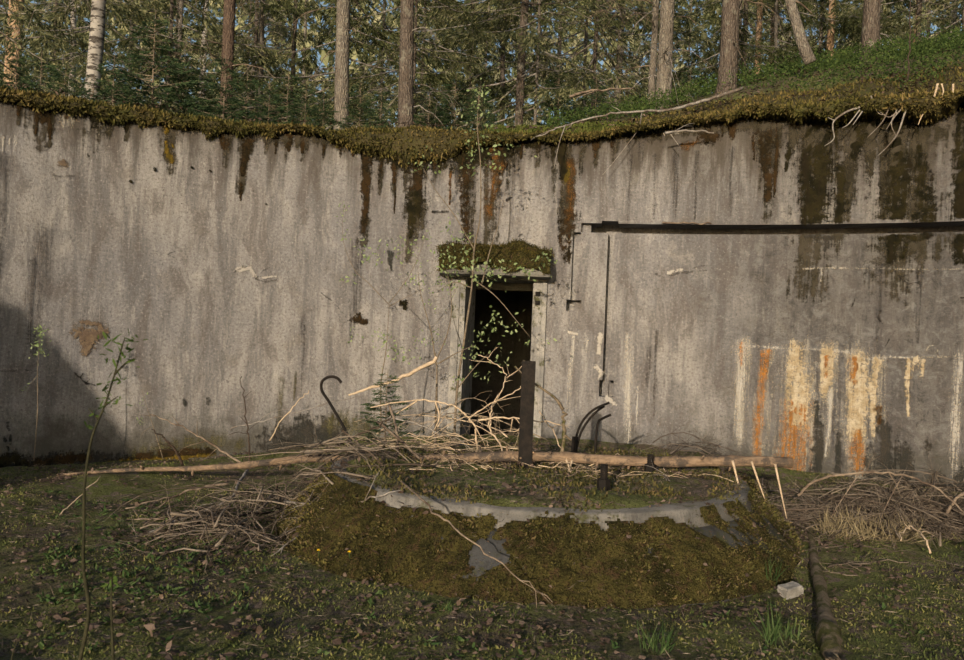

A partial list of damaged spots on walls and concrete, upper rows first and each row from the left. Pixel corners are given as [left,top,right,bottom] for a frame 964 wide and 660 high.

corrosion [731,336,887,478]
leakage [863,323,964,491]